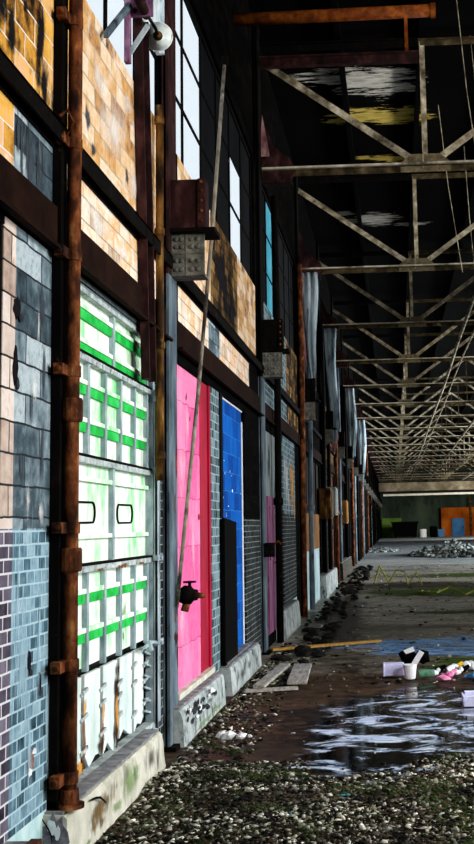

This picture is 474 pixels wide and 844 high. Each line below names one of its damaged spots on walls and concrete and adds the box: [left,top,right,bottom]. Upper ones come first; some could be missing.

leakage [0,0,16,53]
corrosion [77,702,86,775]
leakage [93,783,125,831]